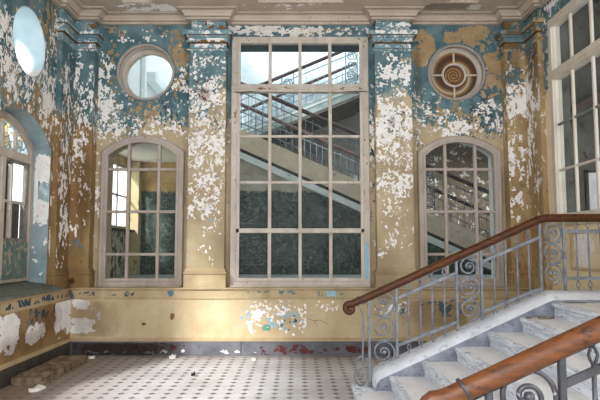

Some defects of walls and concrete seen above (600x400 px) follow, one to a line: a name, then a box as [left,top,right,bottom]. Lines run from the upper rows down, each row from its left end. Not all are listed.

peeling [0,2,542,280]
flaking render [0,299,101,356]
peeling [246,300,306,336]
peeling [254,344,374,356]